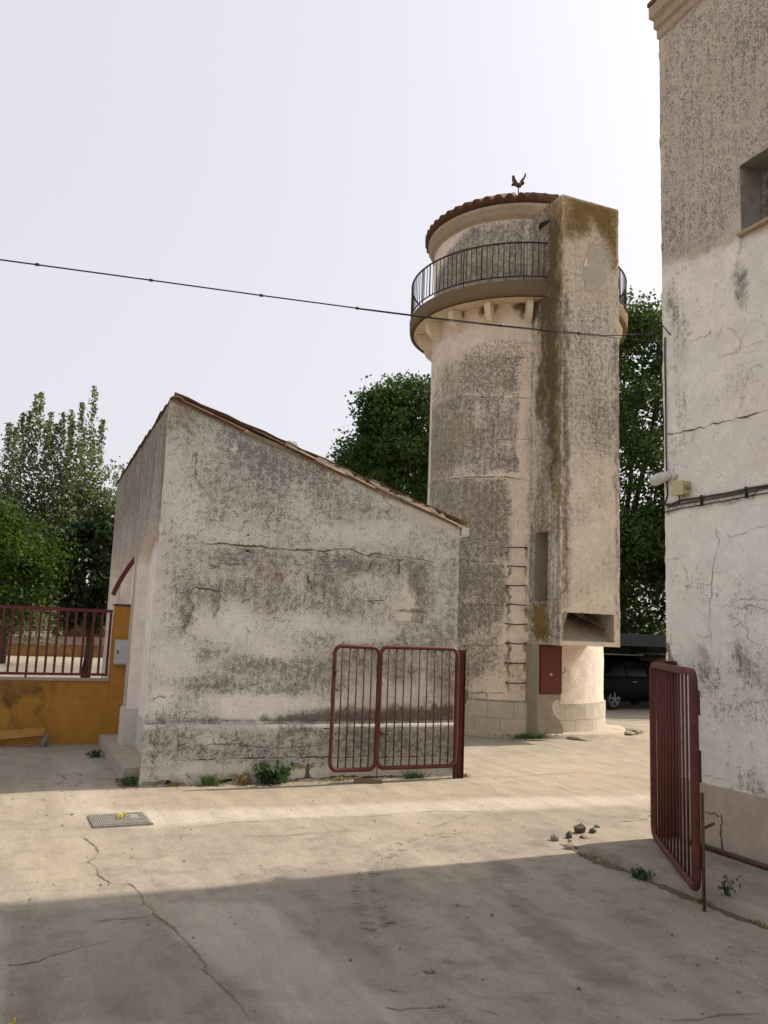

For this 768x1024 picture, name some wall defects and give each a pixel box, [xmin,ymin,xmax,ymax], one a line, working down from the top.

leakage [562,298,570,591]
crack [668,410,767,435]
crack [192,542,434,592]
crack [696,526,767,646]
crack [1,837,249,1017]
crack [559,843,768,929]